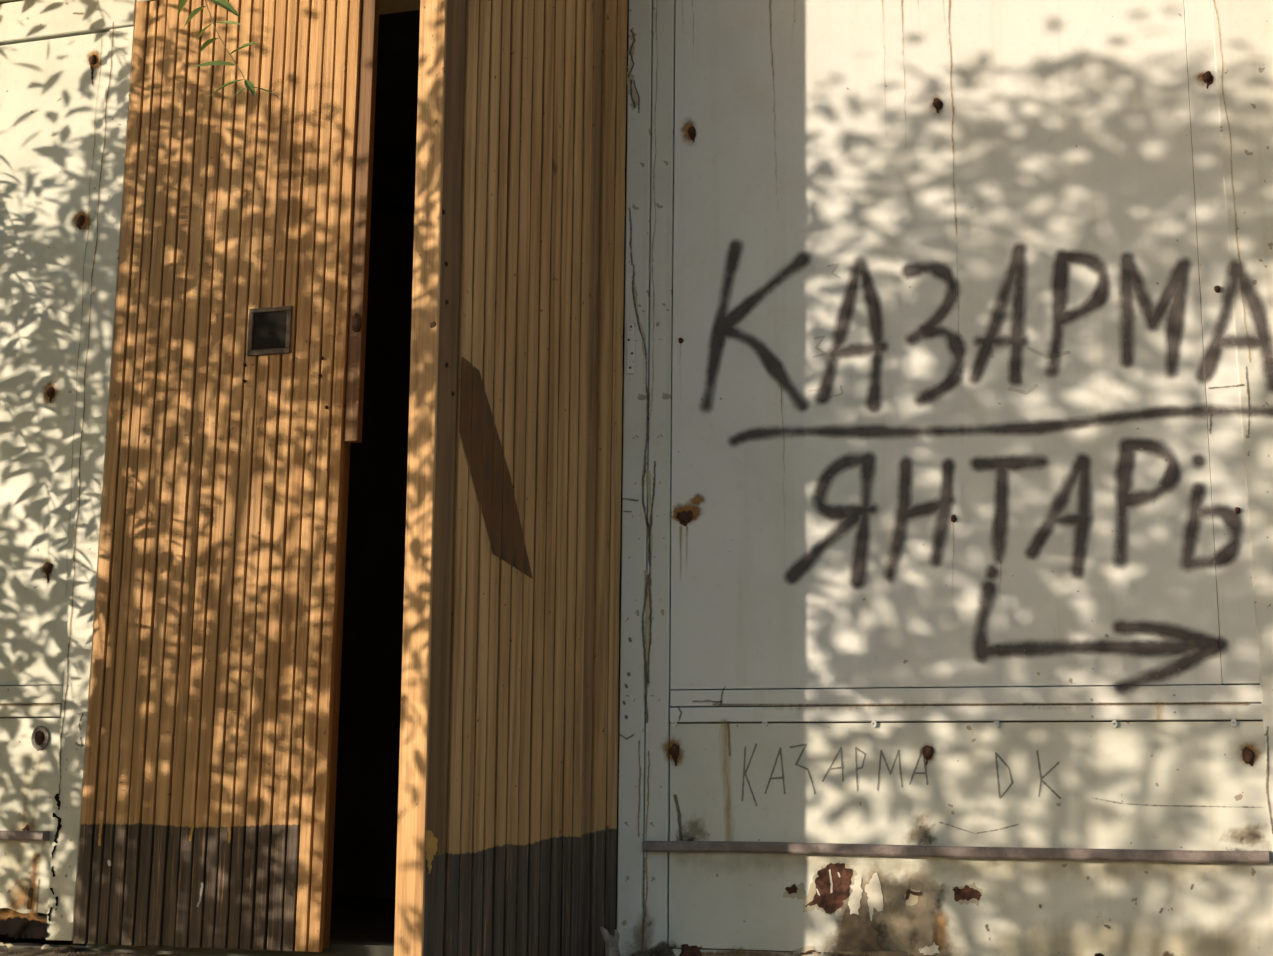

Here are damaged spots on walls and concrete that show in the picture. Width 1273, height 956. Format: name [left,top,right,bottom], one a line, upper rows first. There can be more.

rust [88,52,100,84]
rust [682,121,696,142]
rust [74,212,91,230]
rust [672,494,704,546]
rust [664,739,682,766]
rust [0,854,48,939]
peeling [783,862,883,921]
peeling [904,889,922,906]
peeling [952,883,983,905]
damp [830,873,950,956]
rust [631,925,799,956]